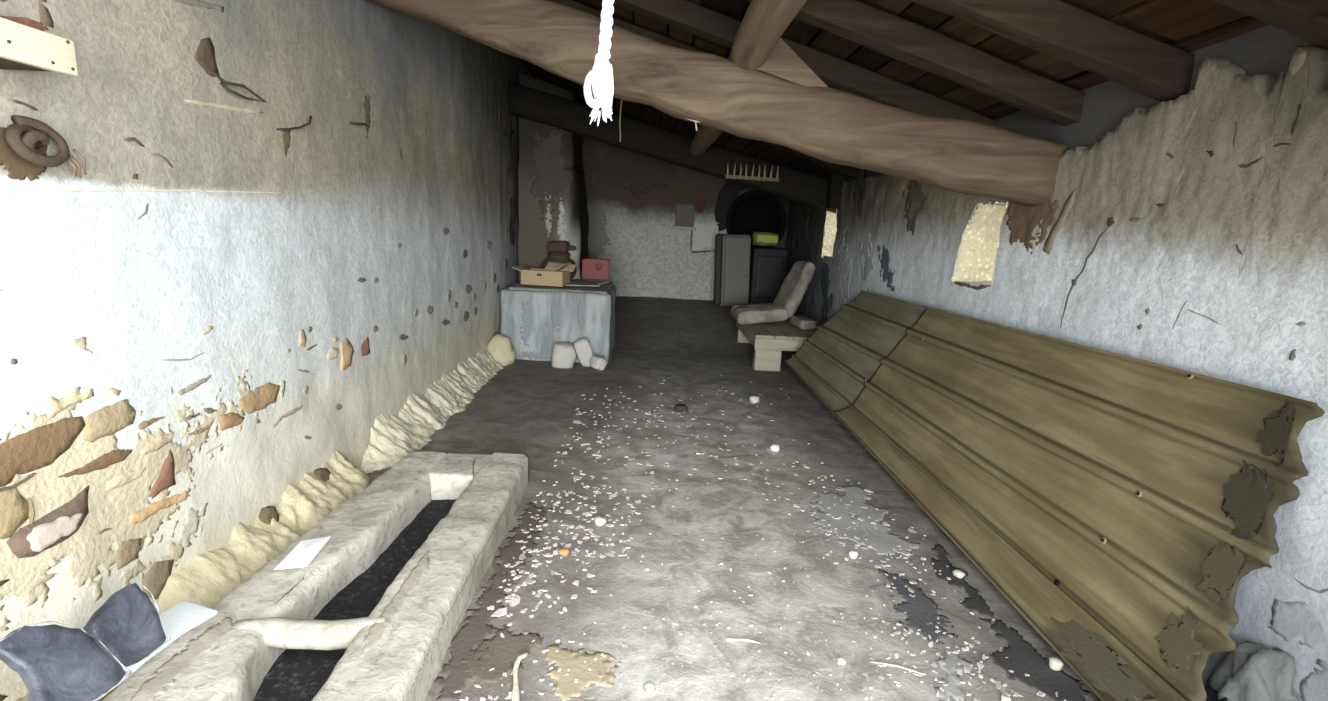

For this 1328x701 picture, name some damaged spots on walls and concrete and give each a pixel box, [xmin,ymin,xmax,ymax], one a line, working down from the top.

flaking render [1006,172,1060,255]
crack [1060,227,1109,328]
flaking render [286,326,312,353]
flaking render [327,325,379,371]
flaking render [0,369,308,632]
crack [1295,579,1328,593]